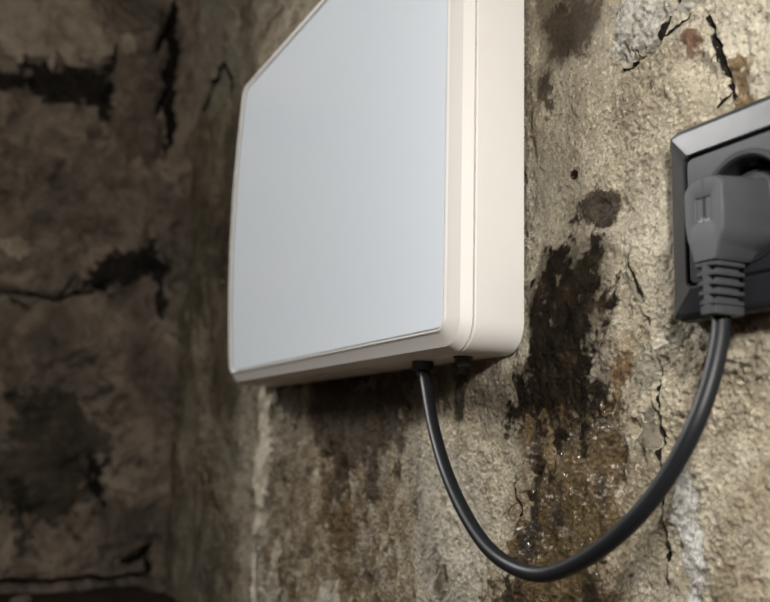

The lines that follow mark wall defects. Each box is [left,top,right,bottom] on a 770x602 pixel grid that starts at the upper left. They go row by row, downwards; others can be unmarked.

crack [155,0,182,162]
crack [198,27,234,114]
crack [623,49,645,72]
crack [658,0,737,109]
crack [0,277,98,309]
damp [501,187,629,566]
crack [655,366,666,462]
damp [411,439,617,602]
crack [662,487,678,583]
damp [669,472,708,602]